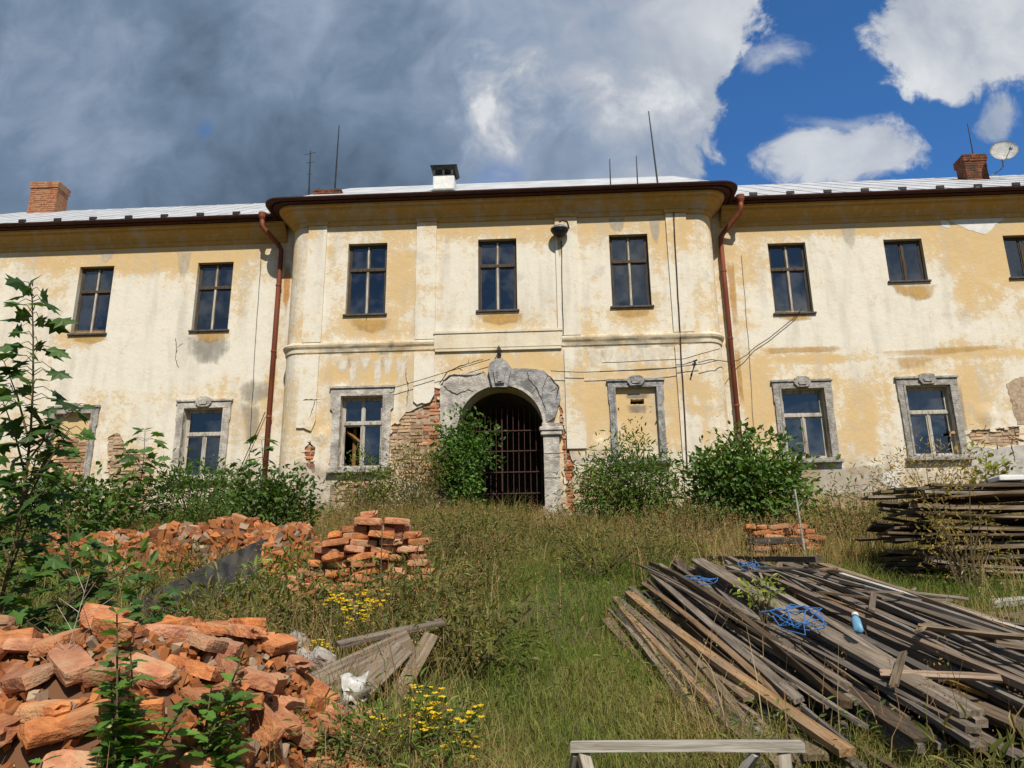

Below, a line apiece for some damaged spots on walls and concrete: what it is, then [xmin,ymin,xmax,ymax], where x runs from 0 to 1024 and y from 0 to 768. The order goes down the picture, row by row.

peeling [924,218,1003,234]
water stain [193,333,224,361]
flaking render [52,437,87,485]
flaking render [302,440,383,508]
flaking render [389,388,440,494]
flaking render [559,405,632,515]
flaking render [949,377,1024,450]